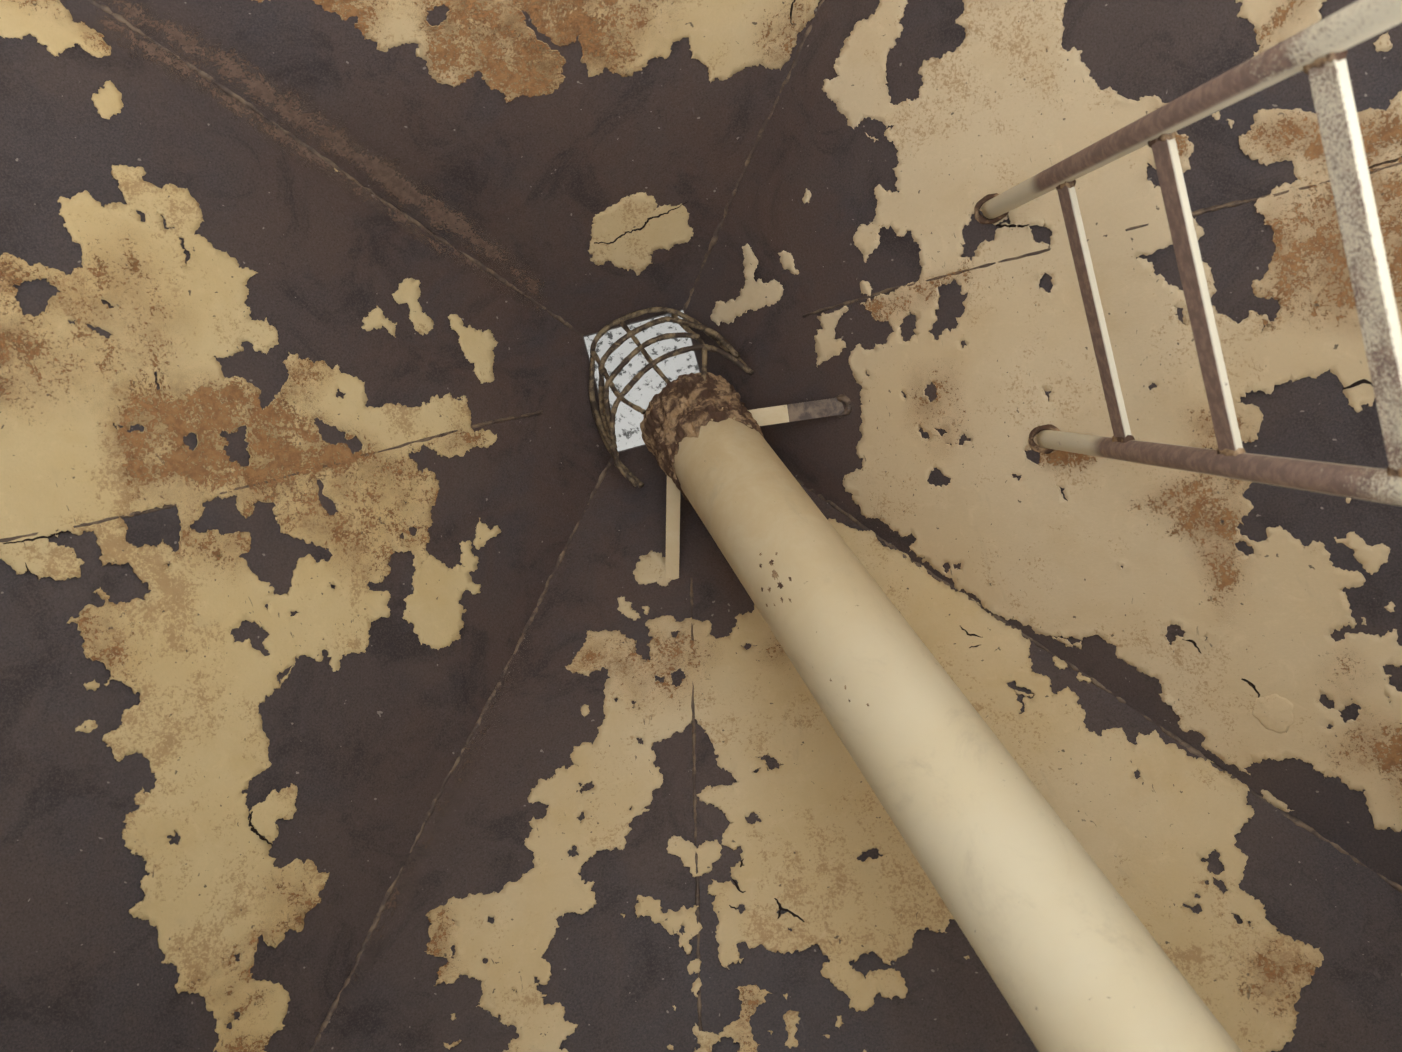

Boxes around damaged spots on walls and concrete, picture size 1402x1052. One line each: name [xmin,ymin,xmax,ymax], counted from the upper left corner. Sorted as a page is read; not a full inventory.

peeling [0,0,111,58]
rust [102,0,545,299]
peeling [320,0,820,103]
crack [594,202,687,244]
peeling [588,192,694,276]
rust [1243,111,1358,333]
rust [1359,107,1402,311]
rust [0,238,488,580]
peeling [0,164,501,1052]
peeling [814,0,1402,1052]
rust [1130,473,1248,606]
peeling [424,551,955,1052]